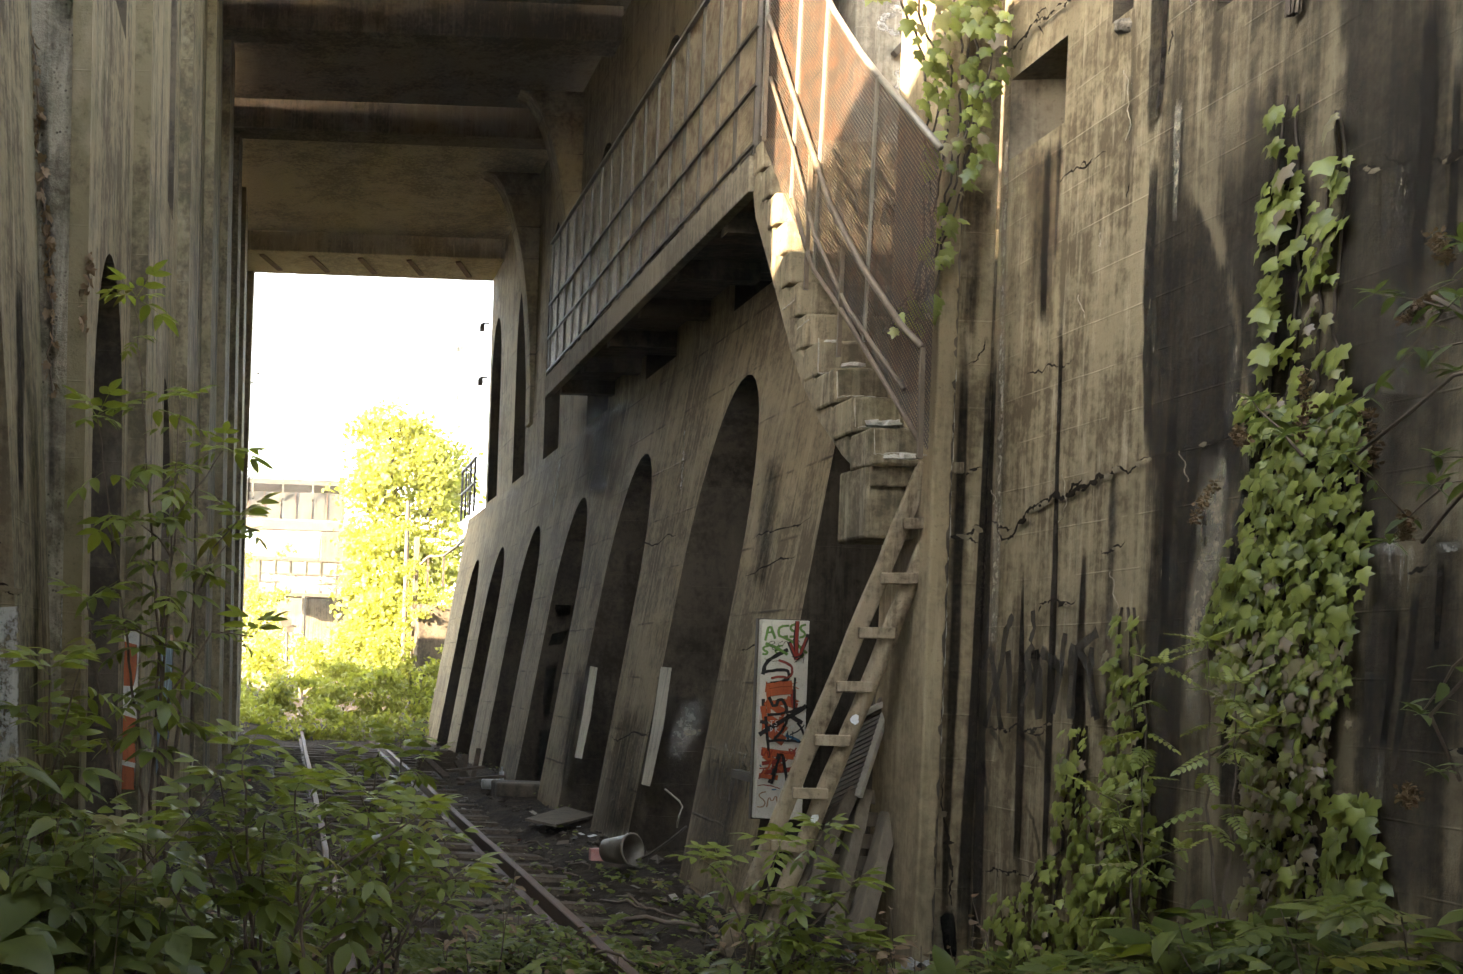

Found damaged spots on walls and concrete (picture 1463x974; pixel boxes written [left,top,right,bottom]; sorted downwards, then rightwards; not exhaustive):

crack [1007,0,1071,54]
damp [1338,0,1461,510]
crack [950,436,1230,544]
damp [1132,125,1305,890]
damp [1355,543,1460,888]